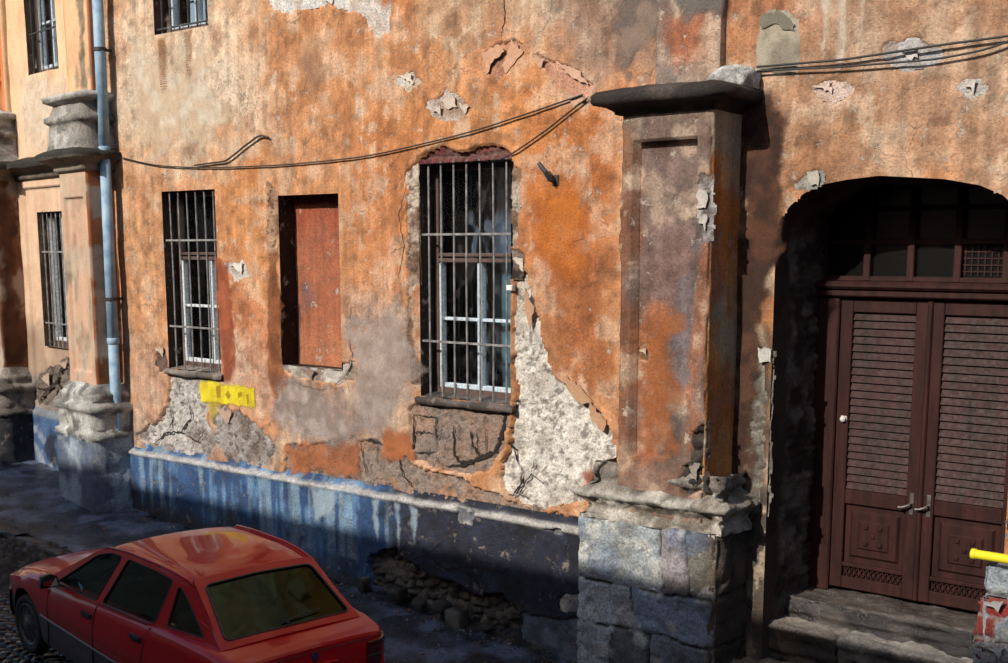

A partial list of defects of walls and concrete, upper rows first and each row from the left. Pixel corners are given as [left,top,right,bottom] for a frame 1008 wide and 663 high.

peeling [270,0,392,39]
peeling [396,72,422,92]
peeling [426,89,469,122]
peeling [482,40,594,106]
peeling [695,173,717,242]
flaking render [286,145,616,525]
flaking render [138,346,232,455]
spalling [358,548,519,630]
flaking render [972,595,1008,663]